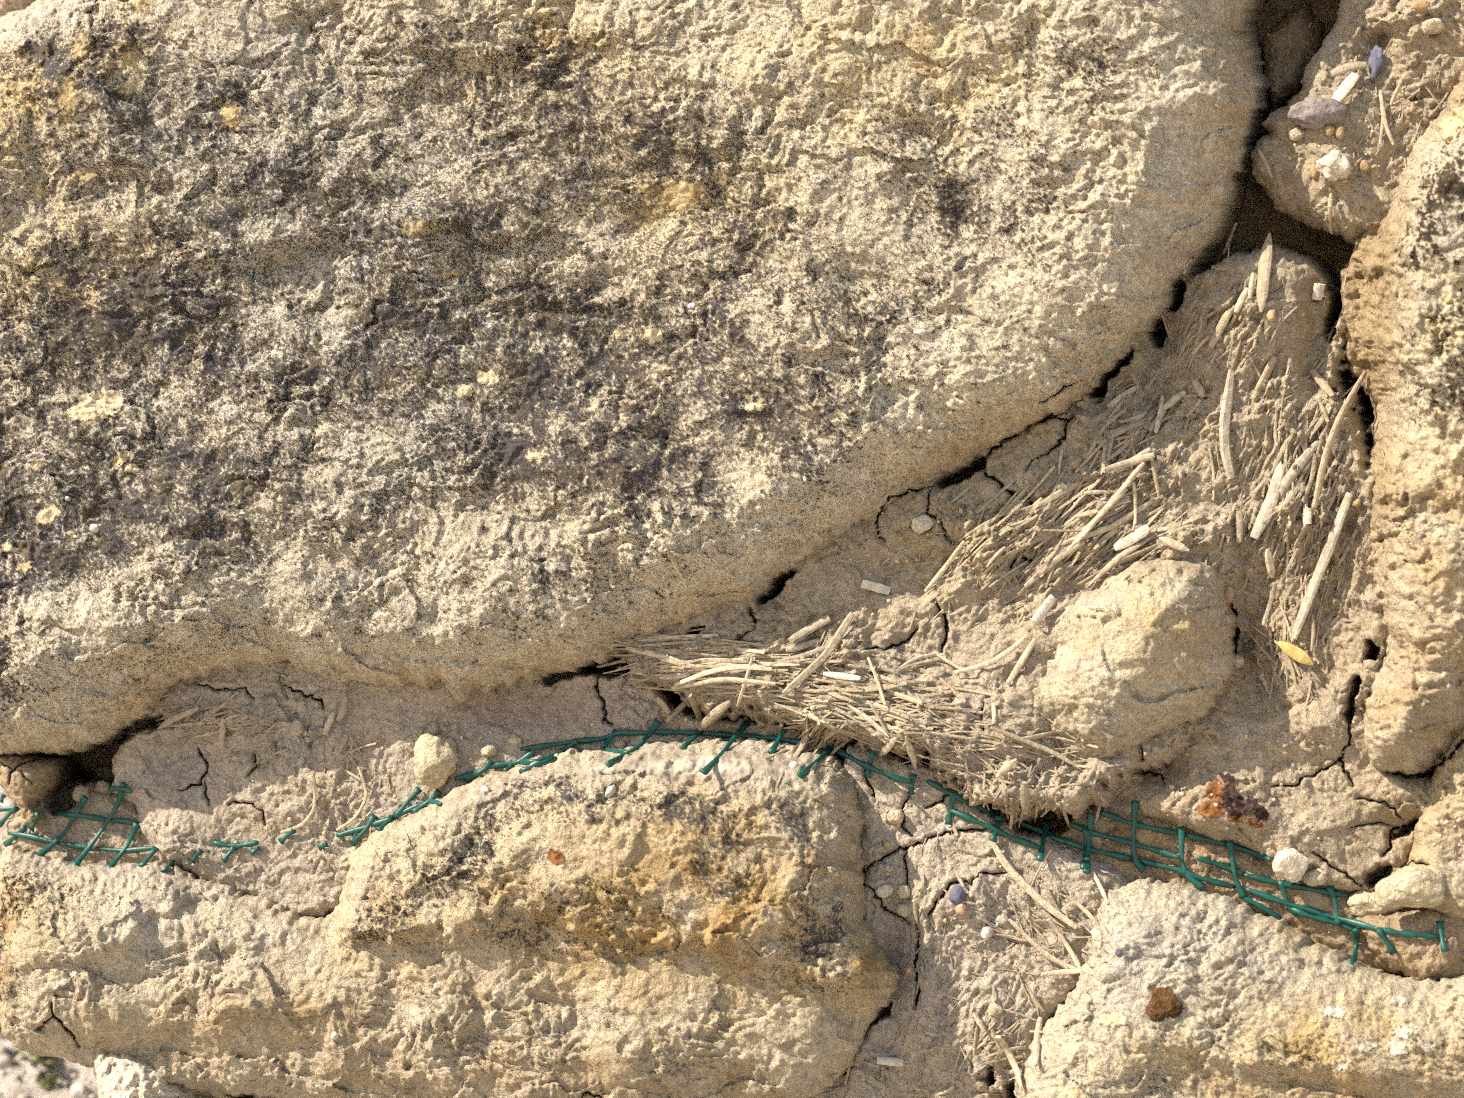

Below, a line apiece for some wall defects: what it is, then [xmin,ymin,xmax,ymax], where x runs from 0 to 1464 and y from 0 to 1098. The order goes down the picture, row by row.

crack [875,486,952,543]
crack [984,380,1081,571]
crack [196,683,324,707]
crack [181,748,266,825]
crack [1275,706,1464,887]
crack [863,777,1006,1009]